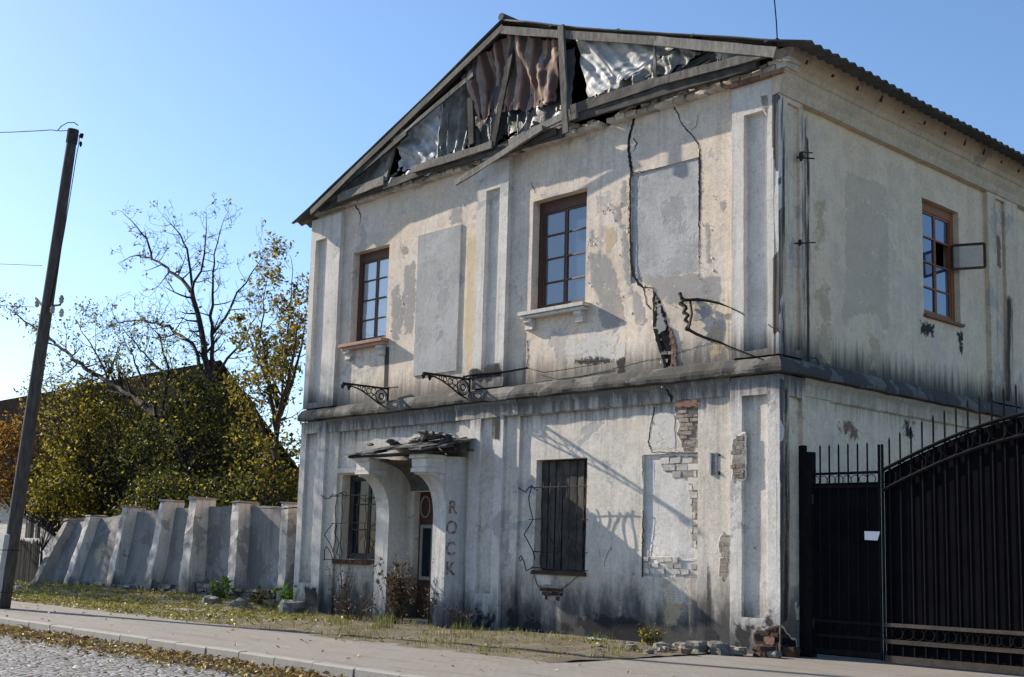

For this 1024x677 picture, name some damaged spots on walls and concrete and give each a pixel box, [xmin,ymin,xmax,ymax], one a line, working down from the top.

peeling [390,246,416,340]
crack [563,107,710,478]
peeling [565,180,723,367]
spalling [643,401,698,578]
spalling [730,432,747,483]
crack [638,510,646,577]
spalling [718,532,730,582]
damp [470,604,661,642]
damp [705,568,718,641]